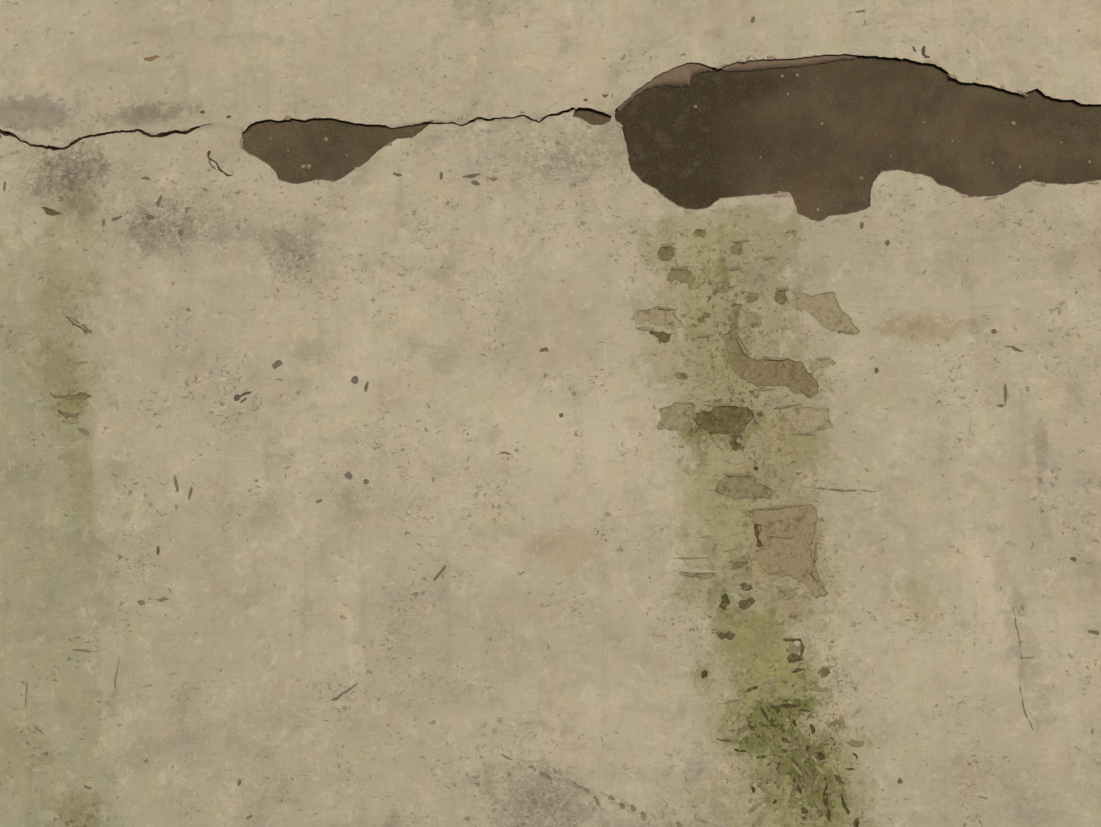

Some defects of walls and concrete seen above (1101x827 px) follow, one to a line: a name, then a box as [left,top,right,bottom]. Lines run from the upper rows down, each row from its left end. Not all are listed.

crack [0,123,233,176]
spalling [239,114,436,185]
crack [430,107,575,126]
spalling [573,46,1101,229]
leakage [674,211,761,253]
leakage [665,282,769,347]
peeling [674,240,836,436]
peeling [657,402,828,622]
leakage [709,423,845,736]
leakage [445,721,734,827]
leakage [729,766,801,827]
spalling [716,638,865,827]